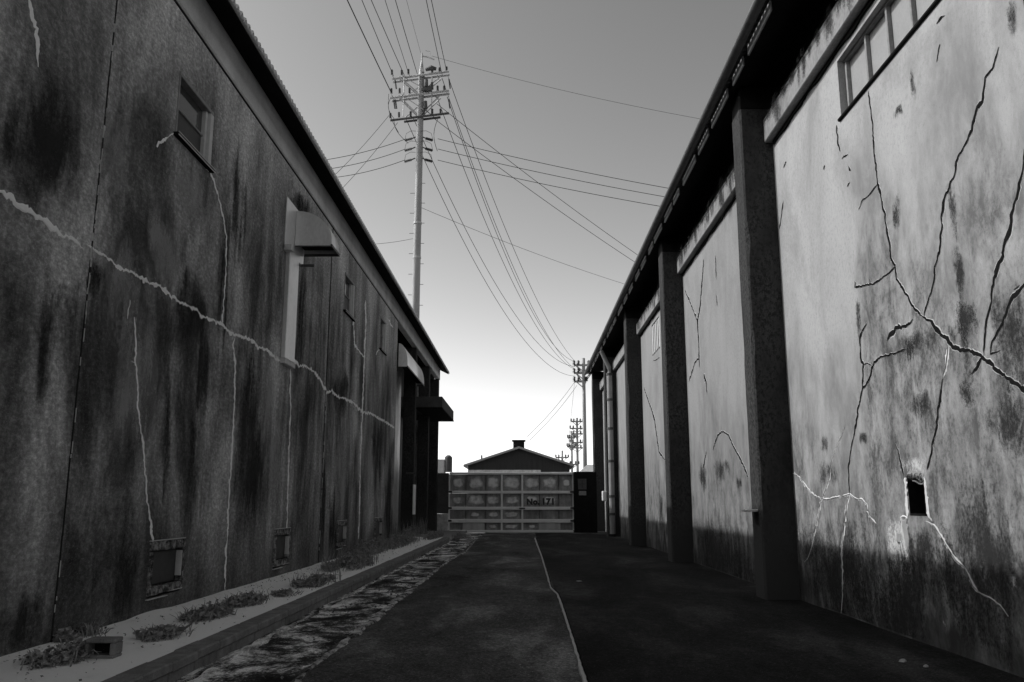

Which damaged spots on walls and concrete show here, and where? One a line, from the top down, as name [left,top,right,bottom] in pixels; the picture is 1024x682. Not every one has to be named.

crack [28,0,40,67]
crack [936,15,945,62]
water stain [37,298,77,402]
crack [0,169,394,588]
water stain [150,153,247,415]
water stain [297,277,307,375]
crack [685,256,718,392]
crack [703,430,748,478]
crack [793,47,1024,616]
water stain [948,253,978,405]
water stain [988,294,1024,458]
water stain [796,479,1016,662]